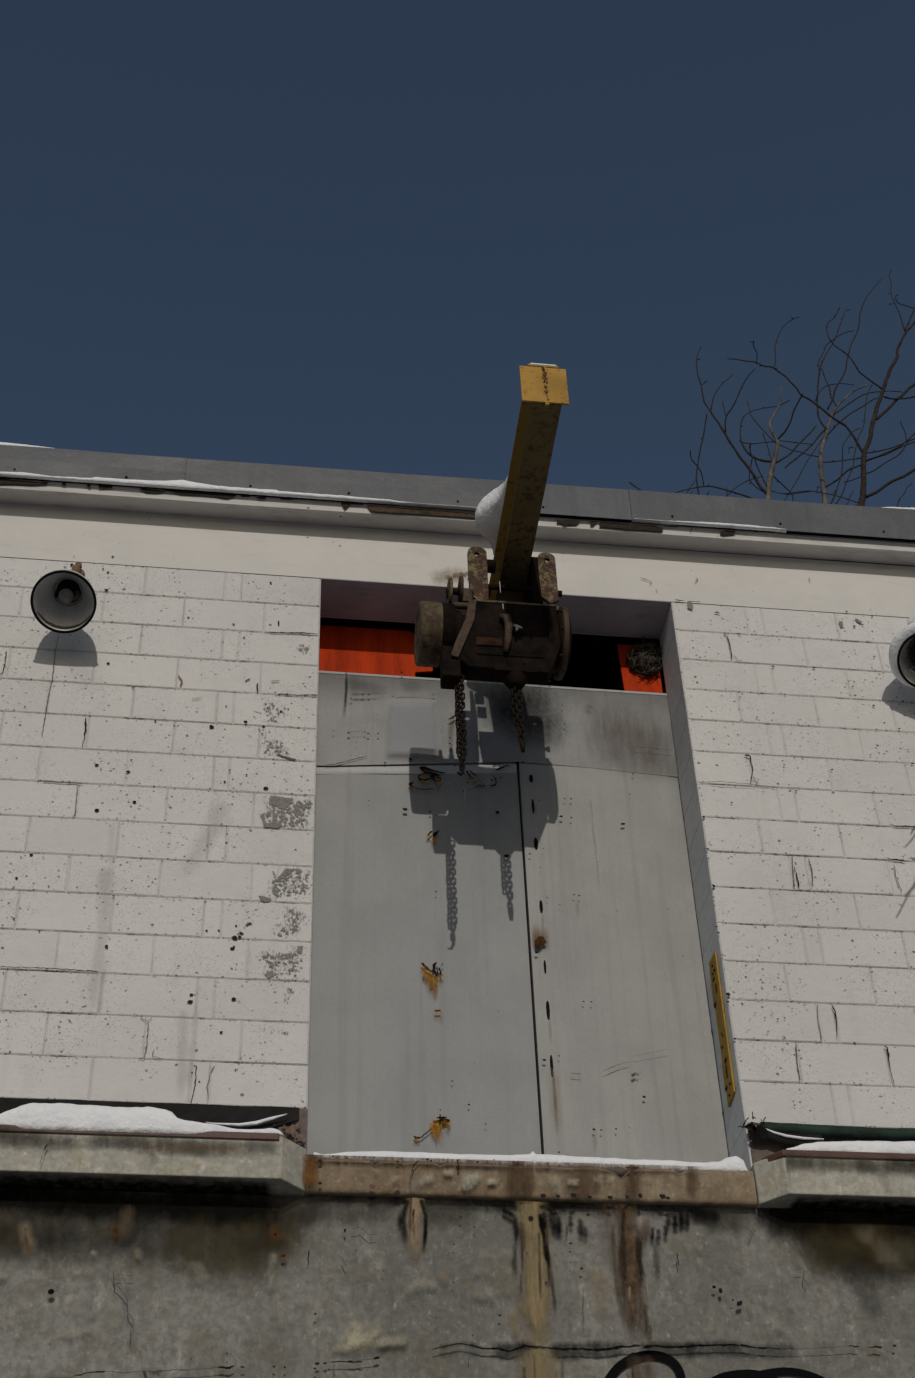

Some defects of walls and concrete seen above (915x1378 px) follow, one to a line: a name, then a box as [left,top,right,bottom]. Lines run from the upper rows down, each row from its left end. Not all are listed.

peeling [258,786,313,832]
peeling [256,868,311,1003]
rust [421,962,443,990]
rust [414,1109,450,1141]
crack [51,1271,380,1378]
crack [431,1291,896,1358]